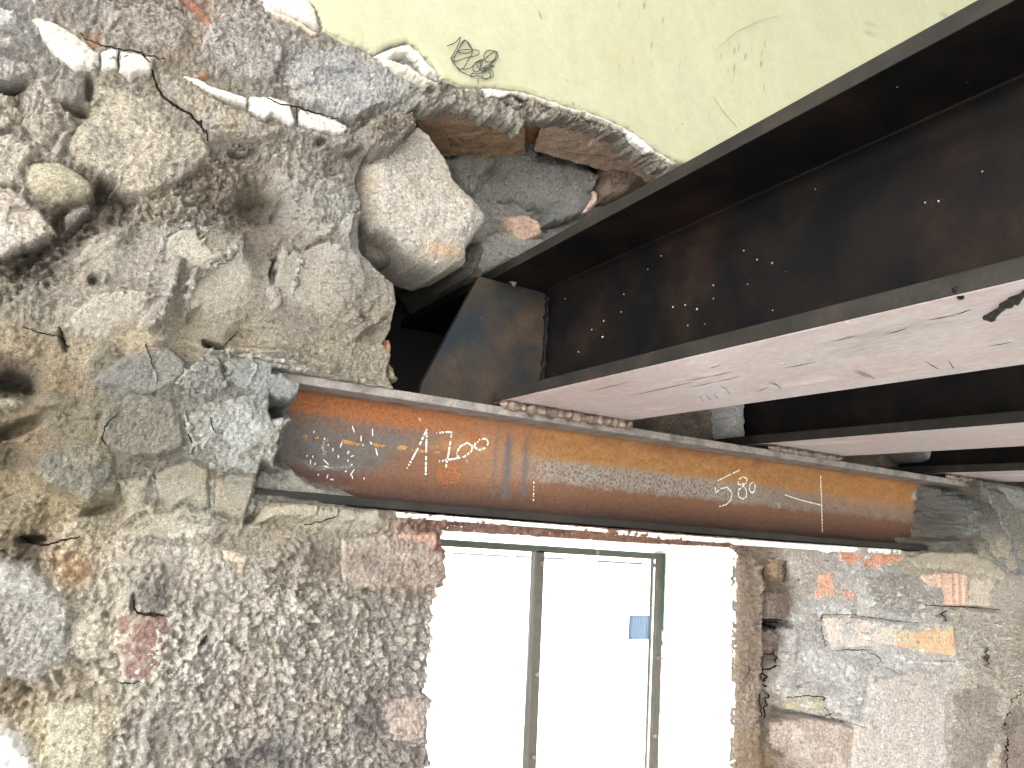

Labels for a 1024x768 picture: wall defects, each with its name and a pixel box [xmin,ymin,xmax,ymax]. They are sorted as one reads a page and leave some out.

crack [80,32,208,141]
crack [267,97,339,119]
spalling [372,45,675,179]
crack [22,326,69,348]
rust [303,435,440,454]
crack [20,536,80,546]
crack [745,621,865,728]